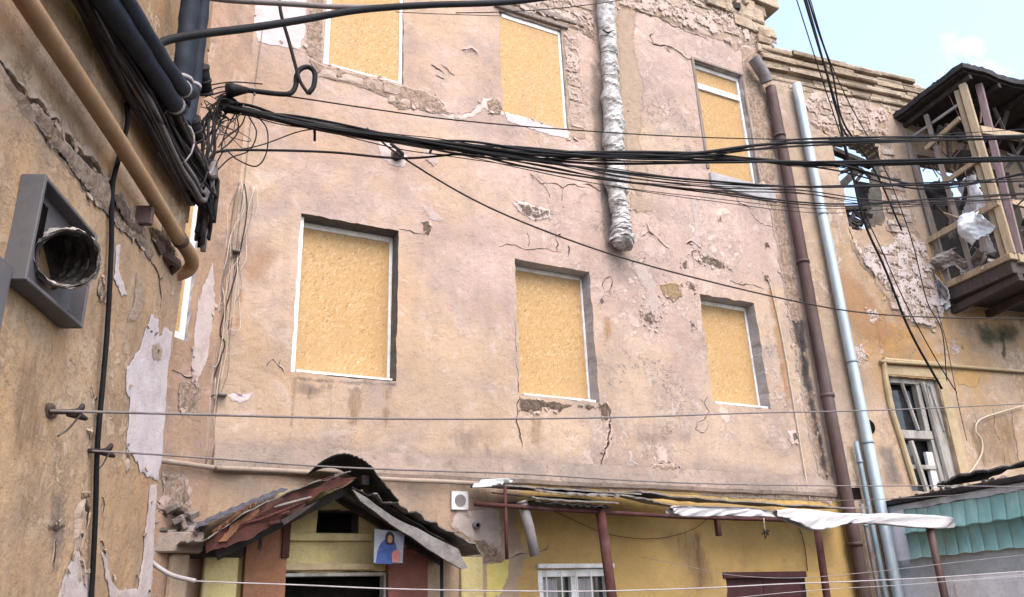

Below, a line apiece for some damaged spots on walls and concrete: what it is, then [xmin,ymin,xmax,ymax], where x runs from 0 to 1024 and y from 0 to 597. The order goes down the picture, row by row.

spalling [254,0,595,141]
spalling [512,199,554,221]
crack [499,233,570,256]
crack [530,173,602,200]
spalling [615,0,834,480]
spalling [804,92,964,354]
peeling [31,103,219,597]
crack [599,407,614,465]